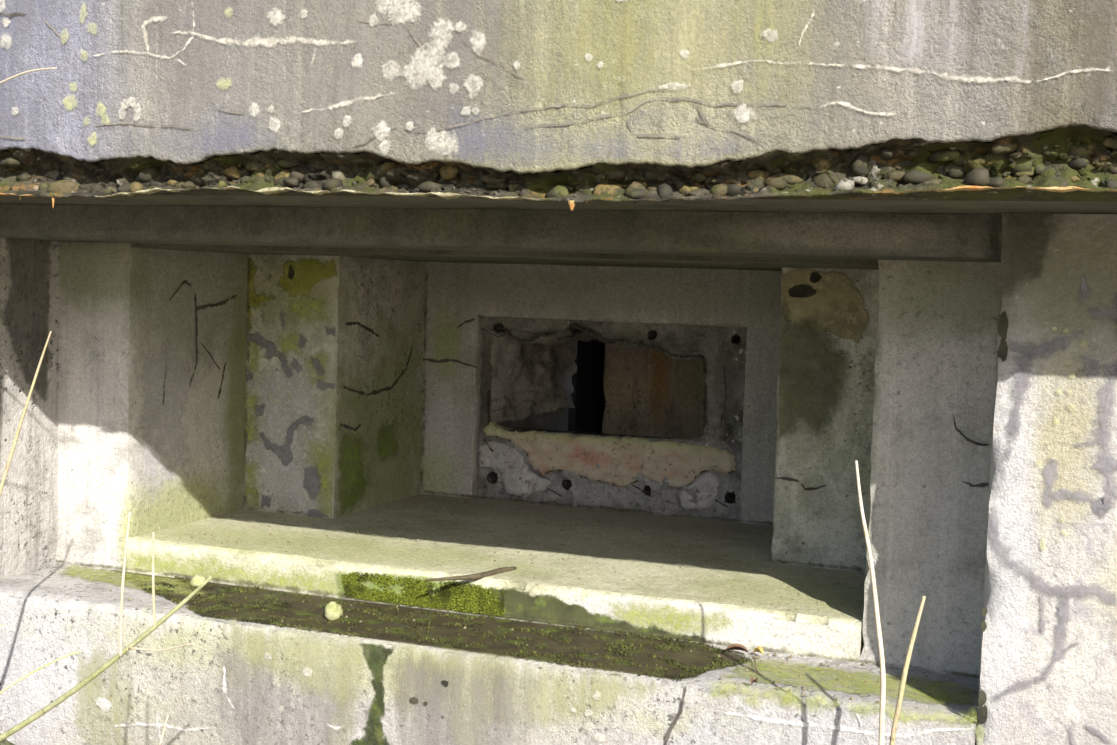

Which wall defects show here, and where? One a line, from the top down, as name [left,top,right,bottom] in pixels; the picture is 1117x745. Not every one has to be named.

crack [94,14,352,65]
damp [309,0,506,121]
crack [799,14,1109,83]
spalling [0,125,1117,211]
damp [997,212,1053,292]
flaking render [478,324,737,510]
damp [777,305,847,435]
crack [1043,364,1117,517]
damp [1082,357,1100,377]
damp [64,556,976,745]
crack [962,481,1117,700]
crack [664,686,686,745]